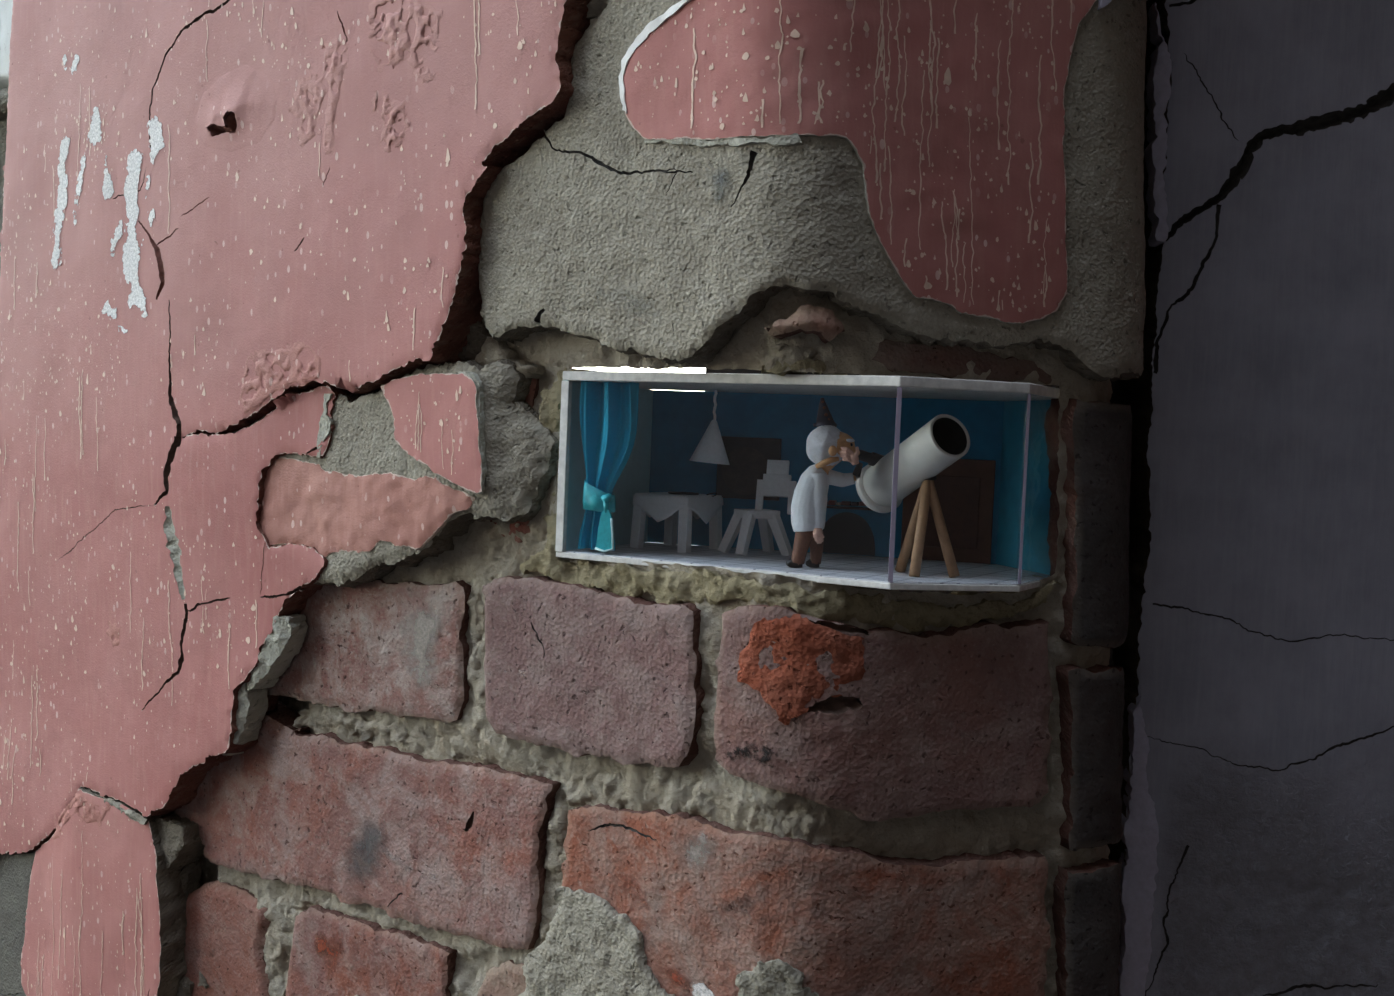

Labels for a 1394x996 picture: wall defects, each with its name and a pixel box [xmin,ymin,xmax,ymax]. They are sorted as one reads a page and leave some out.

crack [1169,0,1196,8]
crack [1153,53,1394,374]
crack [57,0,307,710]
flaking render [233,341,322,433]
crack [534,308,545,323]
flaking render [260,0,1147,588]
flaking render [222,613,308,756]
spalling [737,614,866,725]